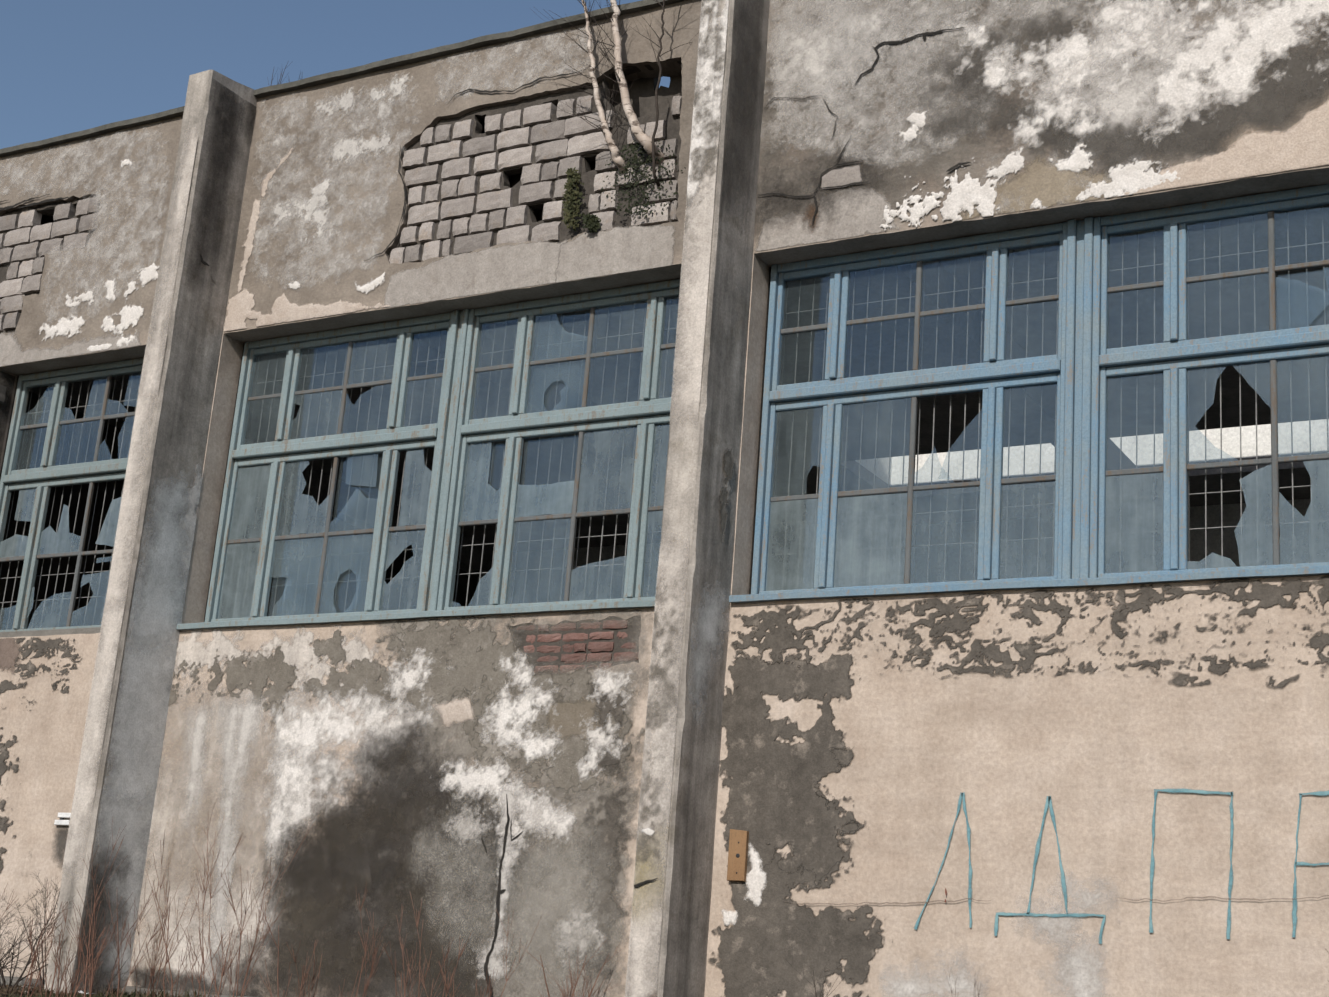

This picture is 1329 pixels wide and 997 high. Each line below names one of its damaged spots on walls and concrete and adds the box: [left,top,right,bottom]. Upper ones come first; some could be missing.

crack [855,27,964,84]
crack [759,95,869,226]
peeling [899,111,927,142]
peeling [1050,143,1161,200]
peeling [0,263,159,366]
peeling [385,220,686,308]
leakage [587,671,630,703]
leakage [639,567,662,812]
leakage [133,648,605,997]
leakage [578,717,621,777]
spalling [709,575,1329,997]
crack [481,794,523,997]